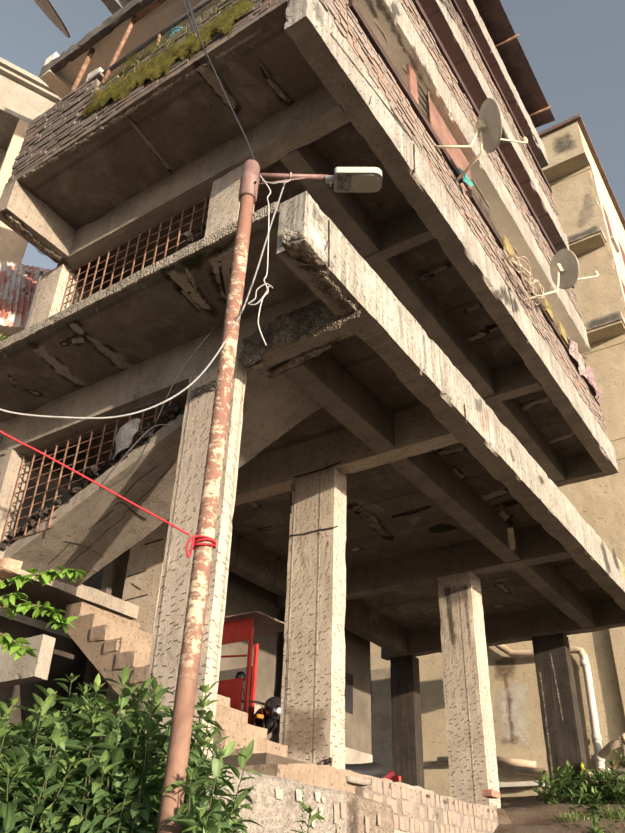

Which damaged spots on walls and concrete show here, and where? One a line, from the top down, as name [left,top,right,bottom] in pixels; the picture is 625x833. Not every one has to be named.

water stain [365,0,432,83]
peeling [161,241,235,316]
spalling [283,240,359,313]
peeling [32,344,85,387]
peeling [58,320,135,371]
spalling [245,338,339,379]
crack [66,463,175,564]
crack [125,570,148,601]
water stain [445,588,456,643]